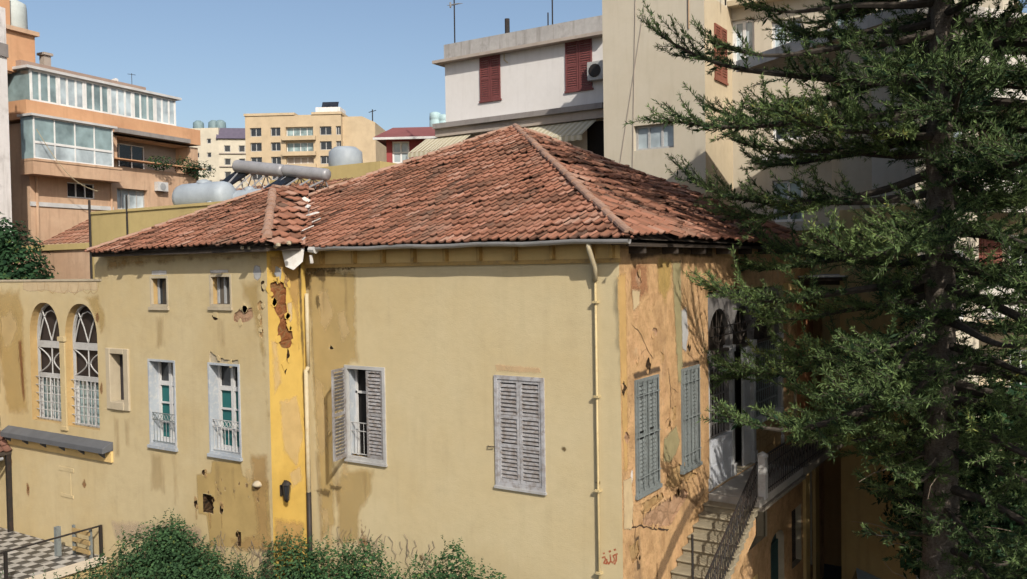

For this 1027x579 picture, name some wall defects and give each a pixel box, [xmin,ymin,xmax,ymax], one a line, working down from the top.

flaking render [234,266,295,375]
leakage [271,257,370,542]
spalling [194,469,248,514]